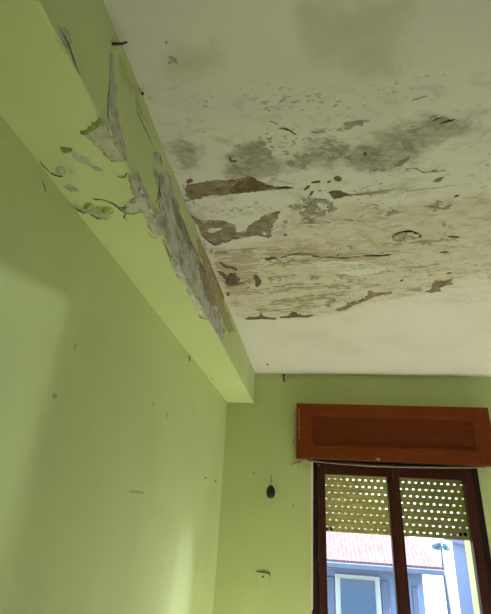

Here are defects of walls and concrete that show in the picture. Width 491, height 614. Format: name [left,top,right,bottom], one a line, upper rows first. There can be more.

crack [61,30,80,75]
peeling [80,54,128,162]
water stain [113,40,491,187]
peeling [183,156,294,201]
peeling [289,178,349,223]
peeling [422,195,459,212]
peeling [122,151,245,340]
peeling [191,211,288,246]
crack [276,251,415,259]
peeling [246,311,314,320]
peeling [324,290,391,312]
peeling [409,272,454,293]